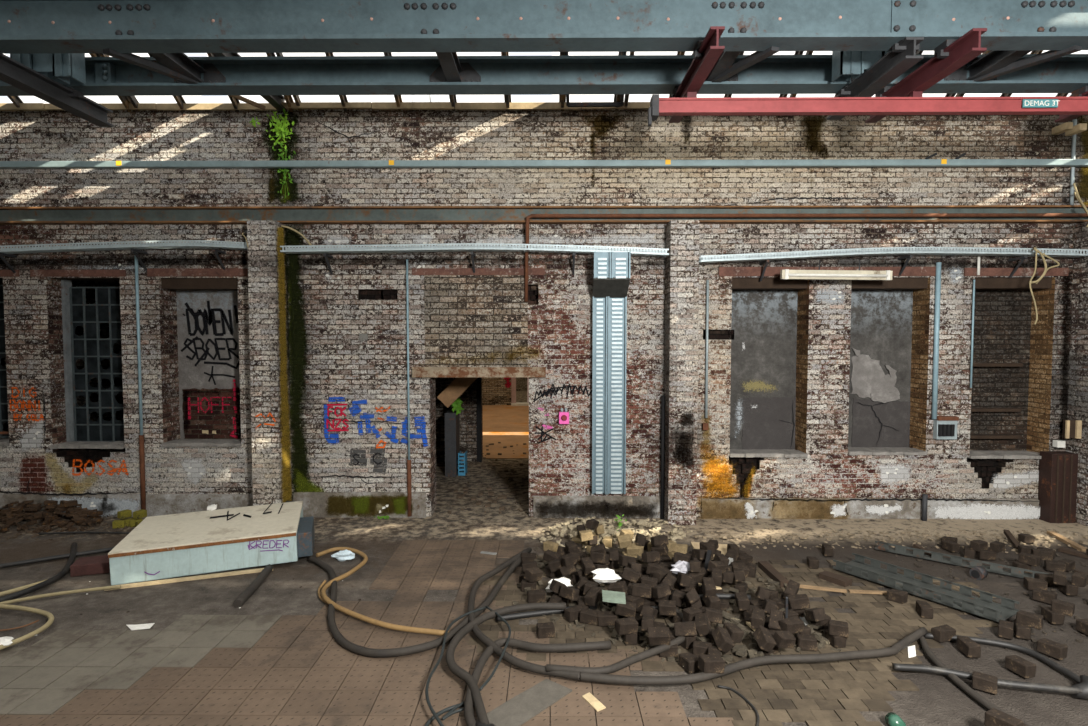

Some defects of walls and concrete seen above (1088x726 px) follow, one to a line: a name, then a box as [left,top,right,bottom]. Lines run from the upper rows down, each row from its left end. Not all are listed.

water stain [802,115,827,158]
flaking render [850,348,900,403]
crack [857,402,898,442]
spalling [19,415,139,518]
spalling [966,458,1039,489]
flaking render [932,503,1040,519]